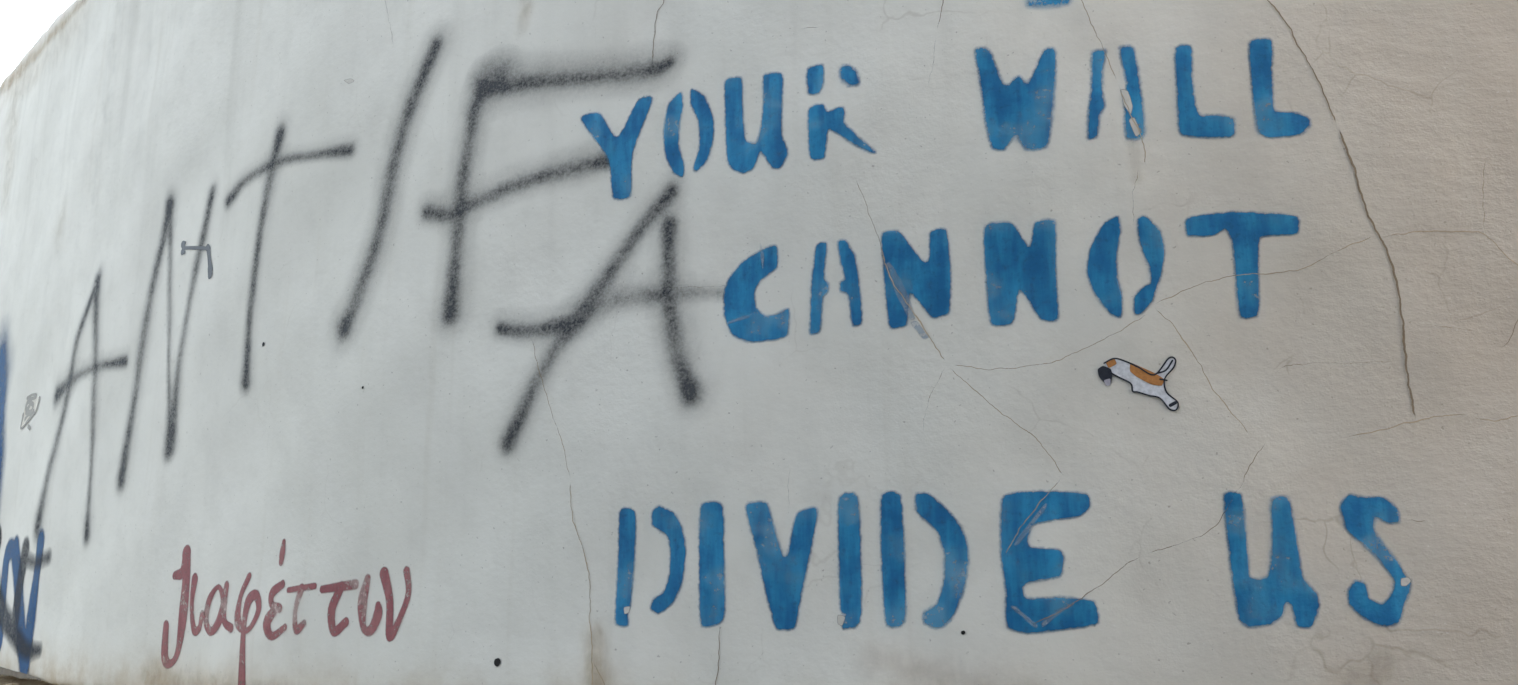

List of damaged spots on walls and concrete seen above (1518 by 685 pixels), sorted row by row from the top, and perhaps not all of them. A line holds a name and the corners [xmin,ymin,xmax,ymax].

crack [533,344,605,685]
crack [857,0,1518,623]